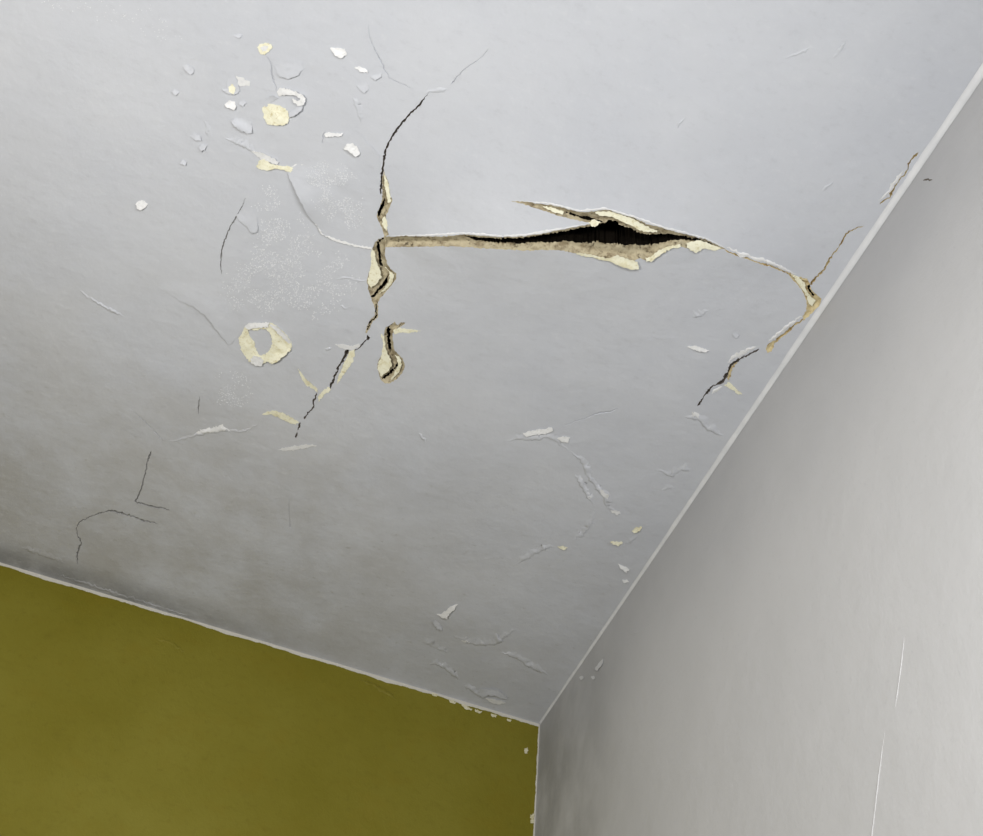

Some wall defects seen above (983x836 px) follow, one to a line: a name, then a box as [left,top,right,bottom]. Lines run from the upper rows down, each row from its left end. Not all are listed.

peeling [330,47,347,58]
peeling [223,76,382,250]
crack [880,153,932,210]
crack [295,25,863,437]
crack [76,452,169,564]
peeling [508,427,621,515]
peeling [433,604,458,631]
peeling [449,683,511,722]